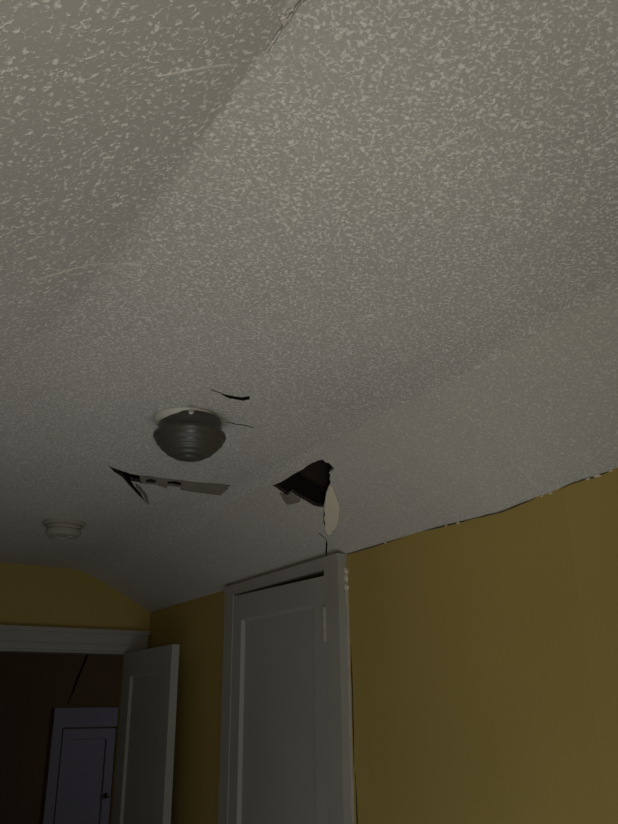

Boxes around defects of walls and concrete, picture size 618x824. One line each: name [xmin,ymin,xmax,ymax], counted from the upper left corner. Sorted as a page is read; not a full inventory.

crack [210,389,250,401]
crack [109,466,231,504]
spalling [277,472,326,505]